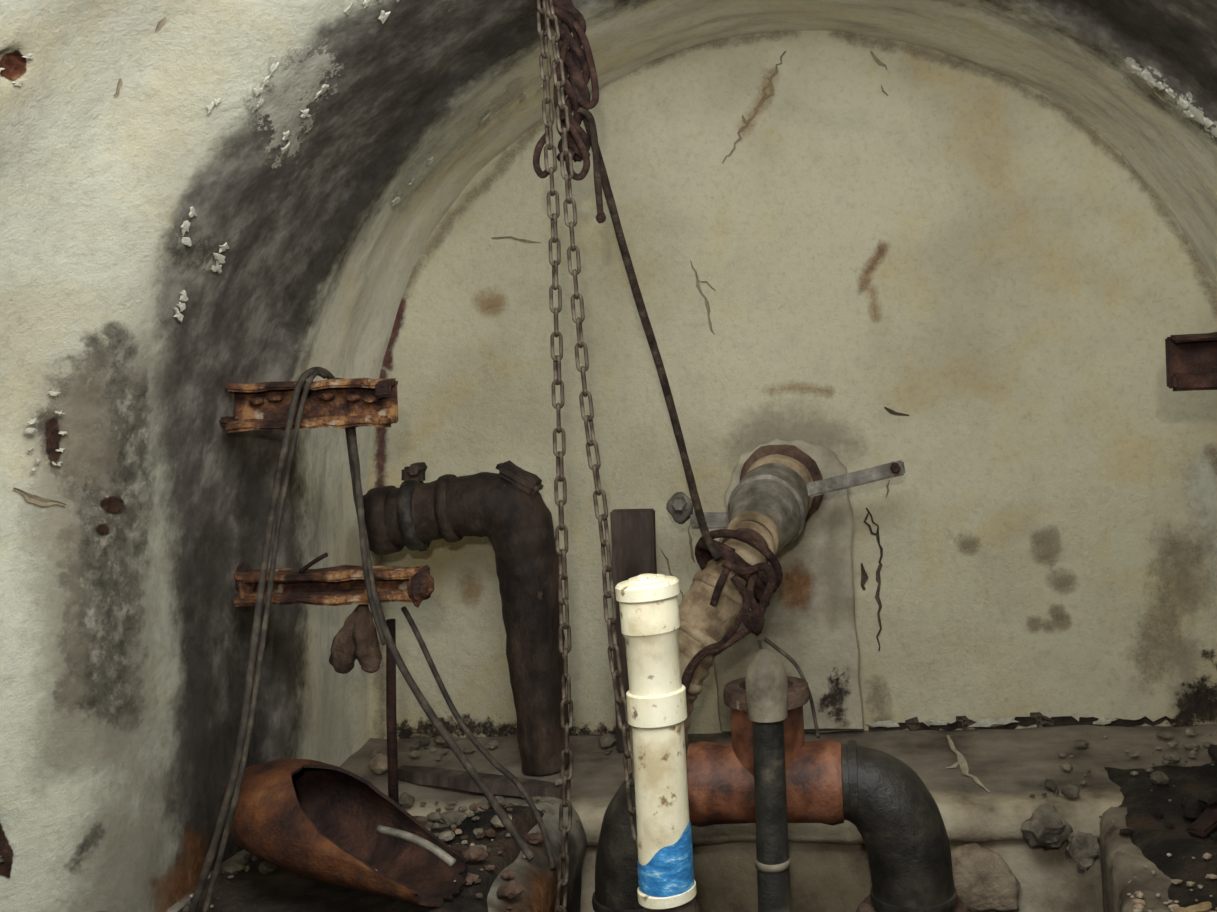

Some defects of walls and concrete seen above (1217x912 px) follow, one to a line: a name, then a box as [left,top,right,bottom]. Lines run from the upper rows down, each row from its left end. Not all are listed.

spalling [0,50,33,87]
crack [722,51,786,164]
damp [982,0,1217,142]
corrosion [860,245,885,318]
spalling [25,410,67,472]
damp [38,0,561,874]
spalling [96,496,127,535]
crack [861,480,890,651]
damp [819,669,850,726]
damp [1170,649,1217,727]
crack [866,712,1175,792]
spalling [0,823,13,878]